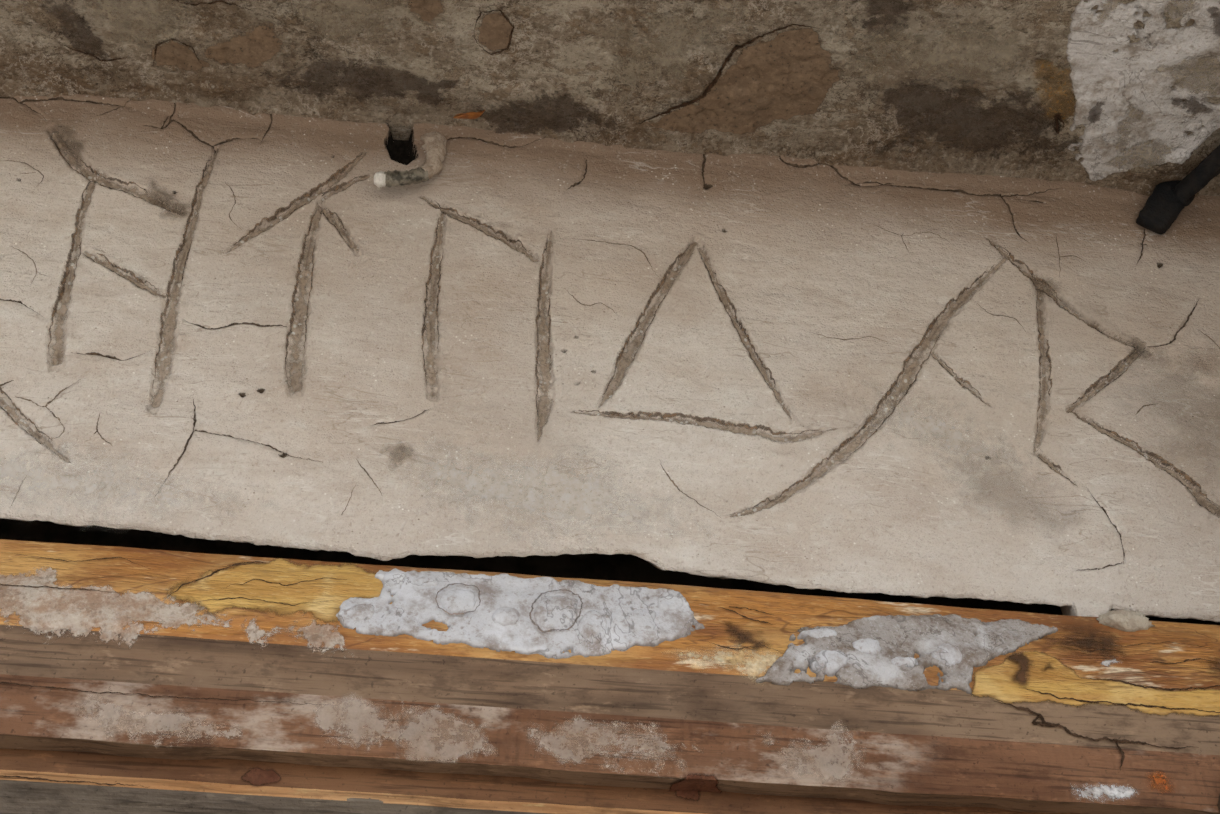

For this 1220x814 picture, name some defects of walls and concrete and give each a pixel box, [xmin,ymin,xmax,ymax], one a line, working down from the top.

crack [0,97,272,152]
crack [640,24,816,124]
peeling [1066,0,1220,181]
crack [779,156,1084,276]
crack [0,246,51,317]
crack [186,321,287,330]
crack [1144,300,1220,349]
crack [0,350,151,438]
crack [155,399,321,496]
crack [661,465,720,517]
crack [1076,488,1125,571]
crack [994,641,1220,768]